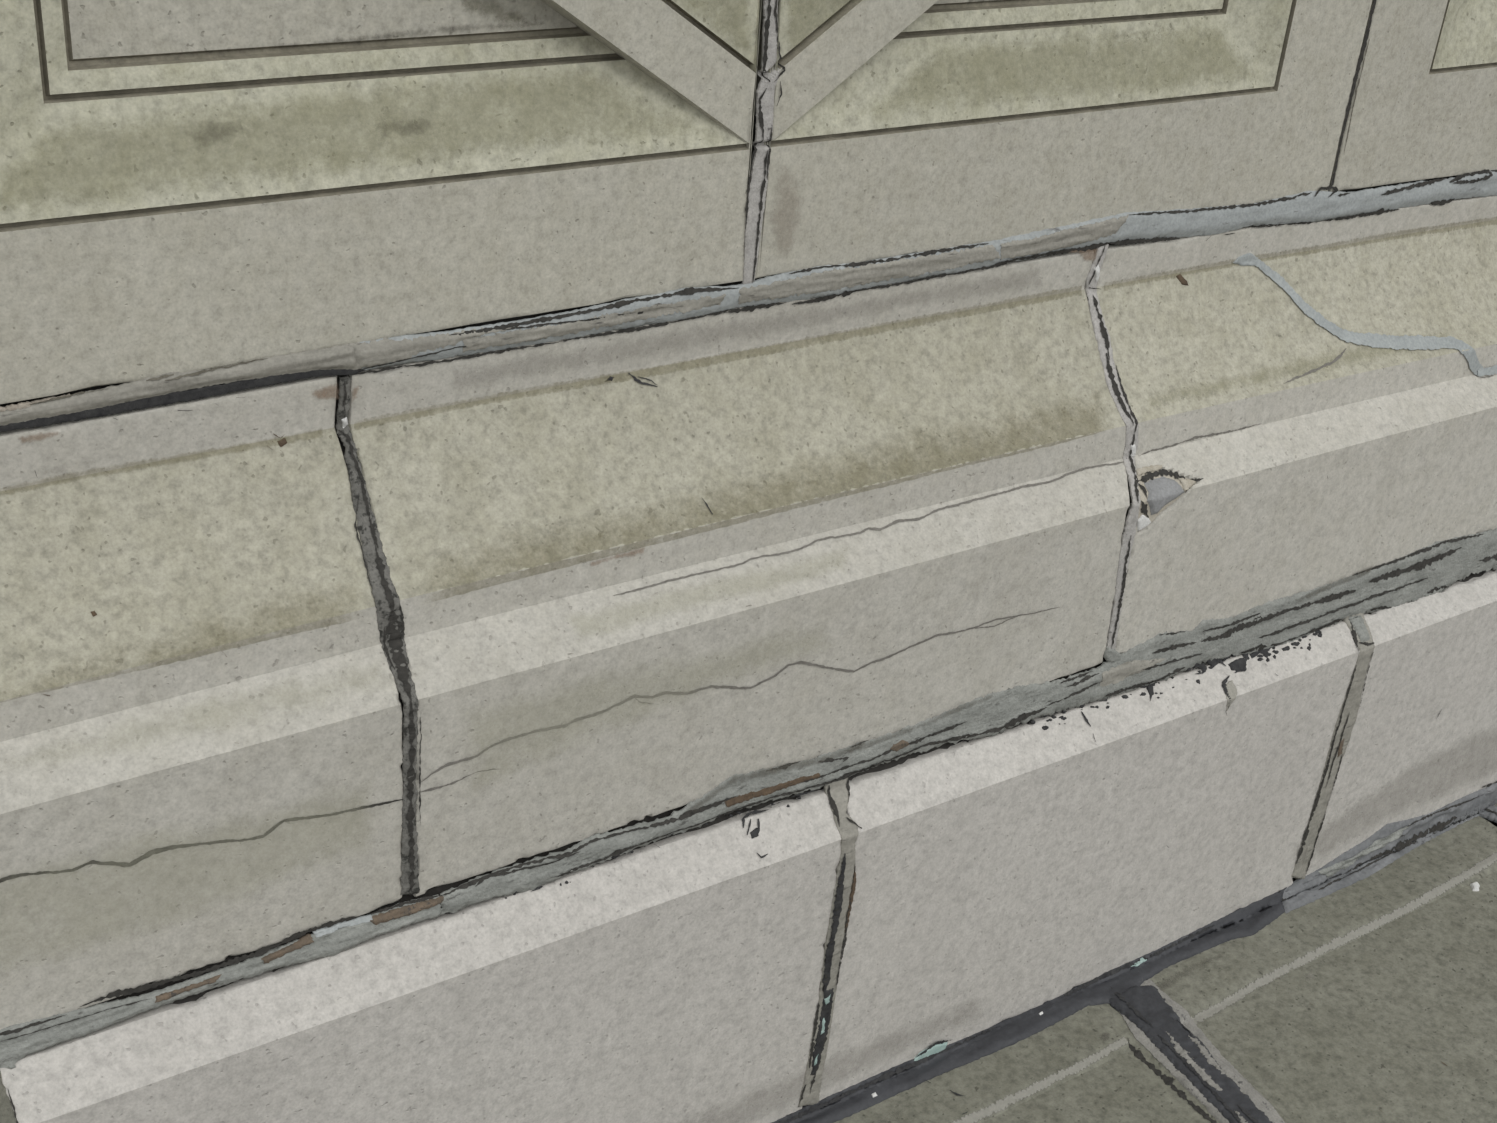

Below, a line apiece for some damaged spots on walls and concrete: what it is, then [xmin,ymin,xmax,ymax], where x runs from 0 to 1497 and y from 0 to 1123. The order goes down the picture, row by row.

crack [1232,253,1497,384]
crack [613,423,1262,596]
spalling [1136,465,1204,532]
crack [0,607,1058,883]
spalling [1030,630,1322,746]
rust [155,974,222,1003]
rust [261,933,314,964]
rust [370,896,444,925]